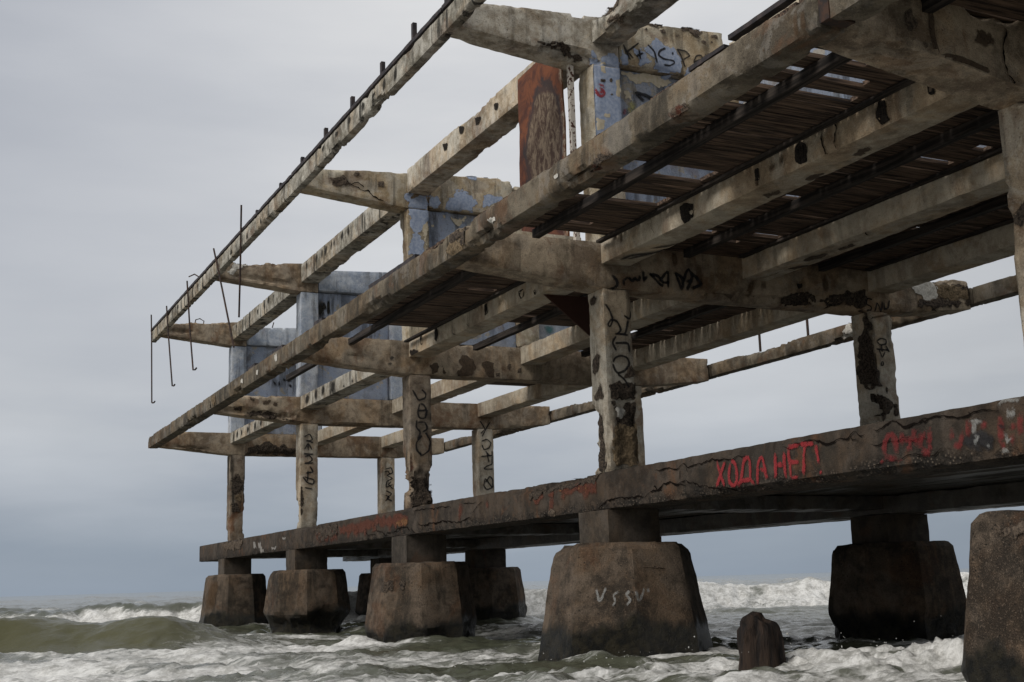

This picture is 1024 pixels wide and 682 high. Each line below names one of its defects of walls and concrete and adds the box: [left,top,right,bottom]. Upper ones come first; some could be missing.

peeling [537,23,718,135]
peeling [404,176,503,256]
spalling [912,282,971,311]
spalling [780,289,899,421]
spalling [529,354,639,500]
crack [783,409,999,467]
spalling [409,476,432,507]
crack [598,455,744,509]
rust [339,513,408,537]